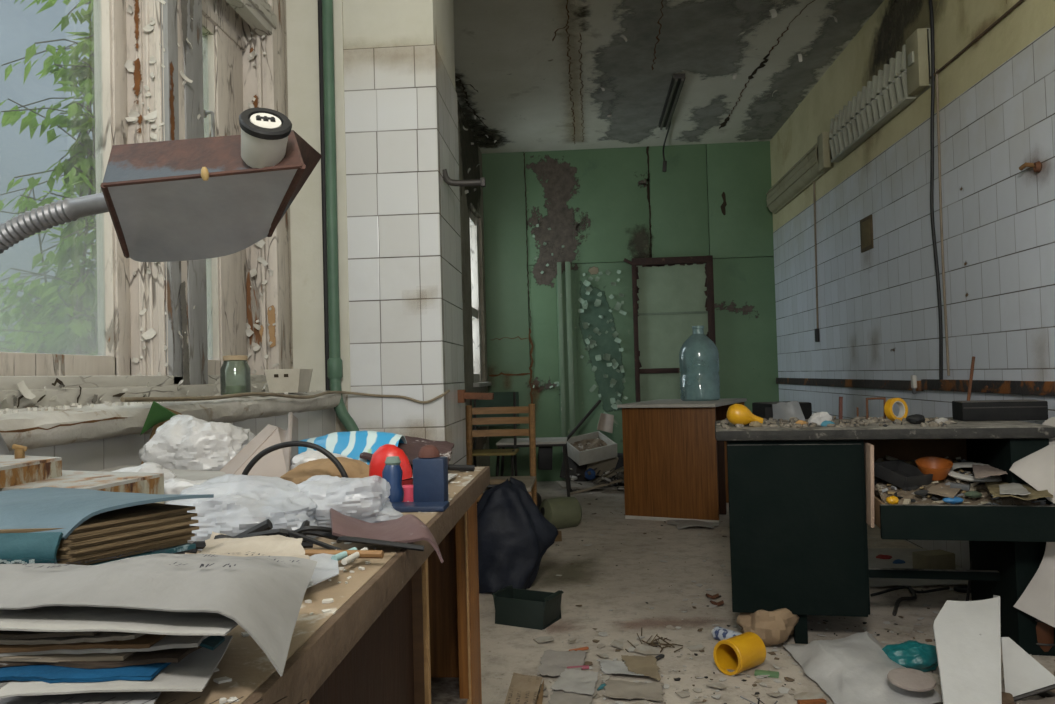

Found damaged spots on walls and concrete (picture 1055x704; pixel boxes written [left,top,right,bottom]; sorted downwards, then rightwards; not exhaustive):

peeling [124,0,194,140]
leakage [455,73,508,148]
crack [719,0,815,129]
leakage [735,0,943,141]
peeling [0,380,64,409]
peeling [132,308,168,387]
peeling [177,281,195,397]
peeling [245,240,279,392]
peeling [526,155,628,414]